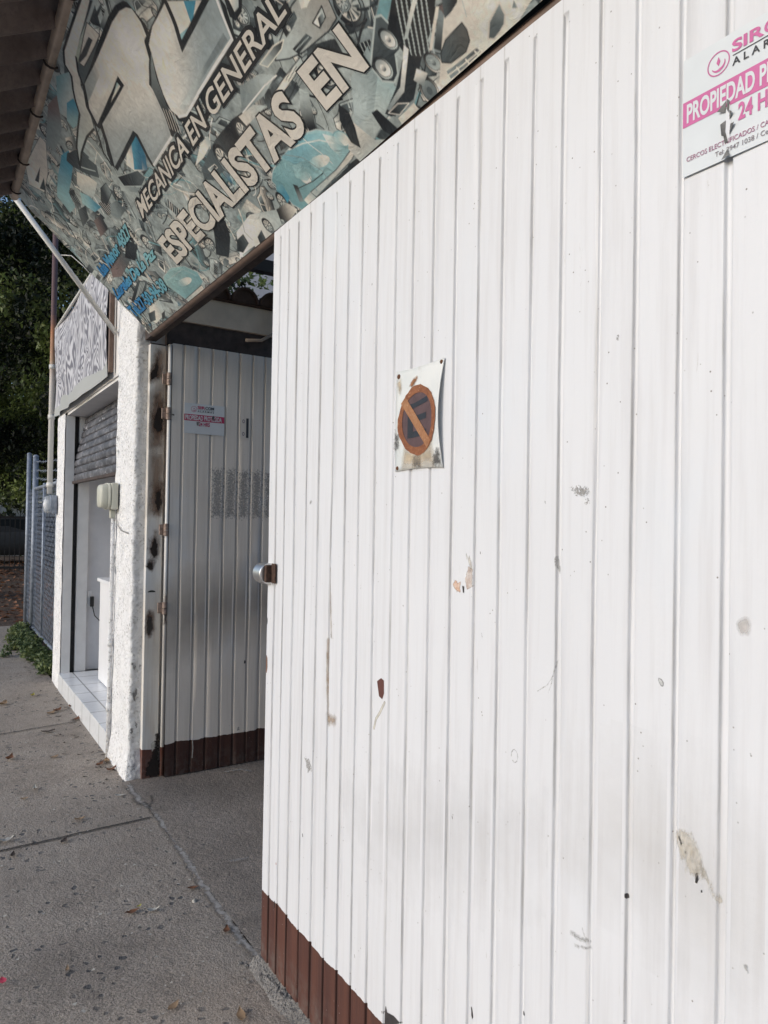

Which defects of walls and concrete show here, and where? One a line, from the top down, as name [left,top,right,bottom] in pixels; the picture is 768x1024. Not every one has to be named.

peeling [453,557,472,593]